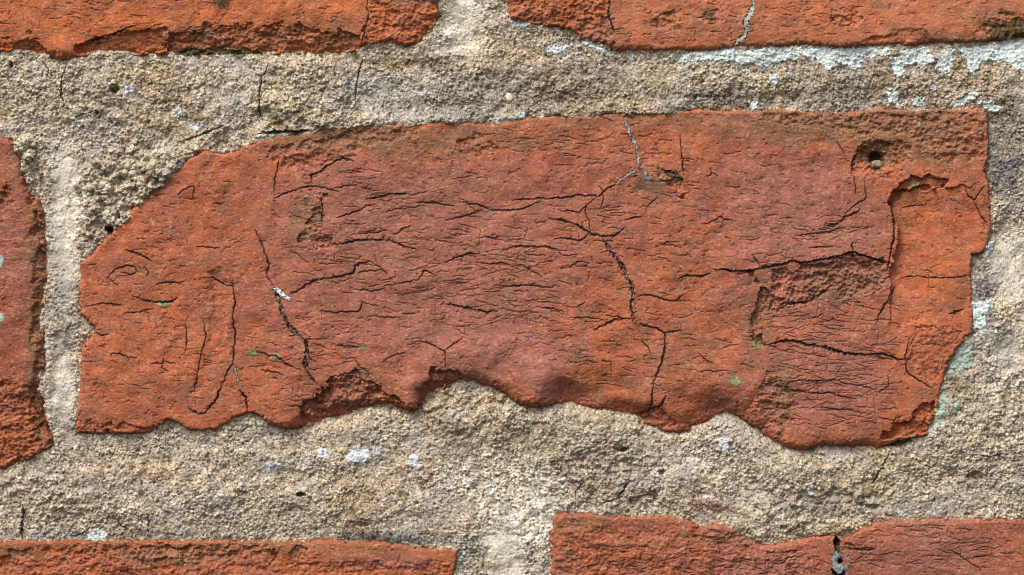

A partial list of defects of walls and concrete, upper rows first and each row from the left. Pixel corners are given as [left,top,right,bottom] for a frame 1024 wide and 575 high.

crack [733,0,755,48]
leakage [679,38,1024,78]
crack [91,250,182,313]
crack [95,277,248,414]
crack [256,114,964,413]
spalling [749,254,887,350]